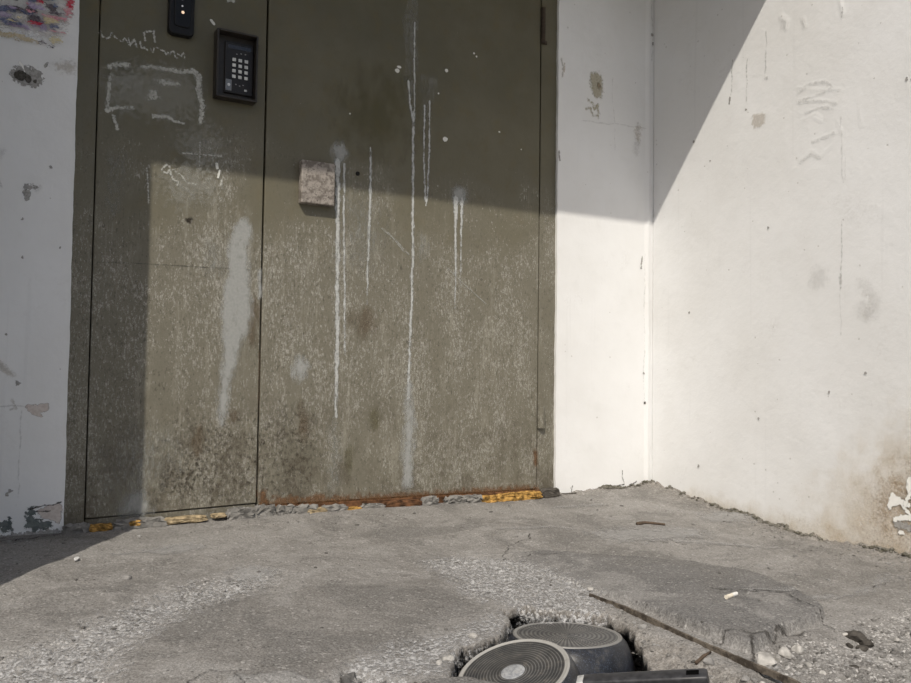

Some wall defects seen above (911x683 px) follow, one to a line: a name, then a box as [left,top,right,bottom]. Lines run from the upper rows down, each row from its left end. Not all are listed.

peeling [0,502,63,537]
rust [260,485,539,506]
peeling [887,477,911,535]
crack [711,587,835,661]